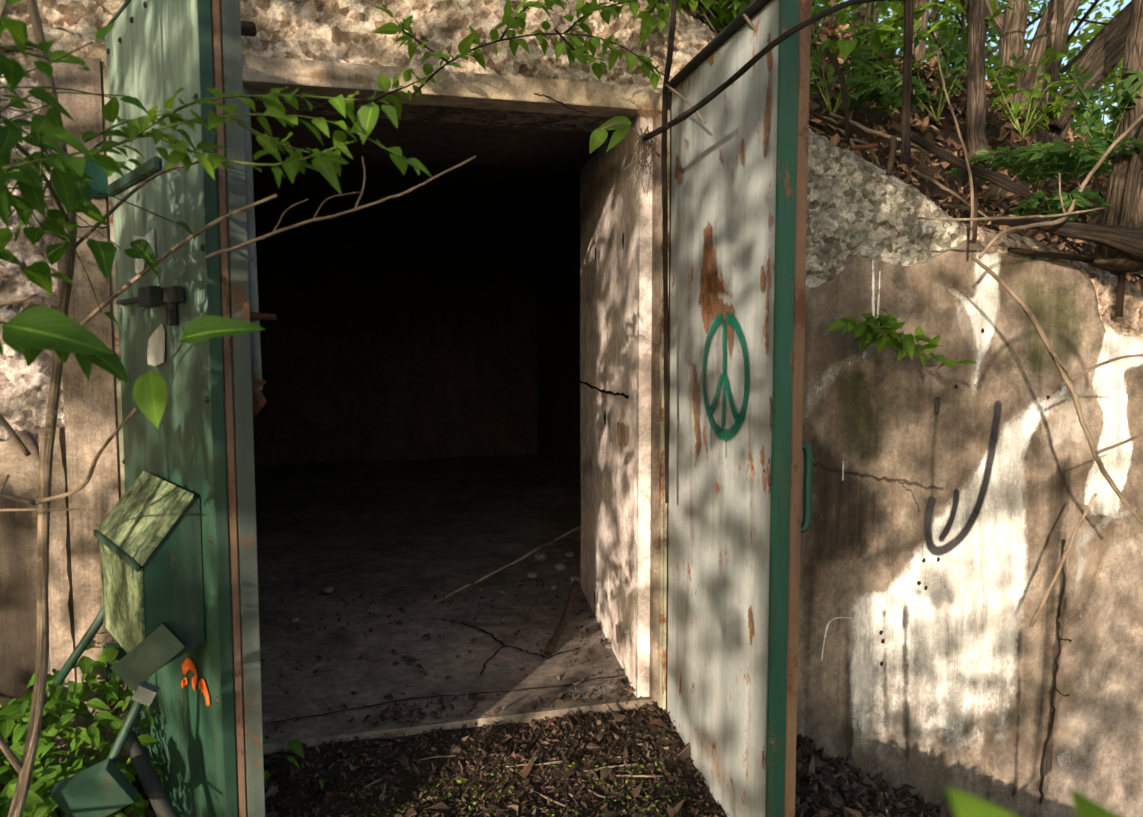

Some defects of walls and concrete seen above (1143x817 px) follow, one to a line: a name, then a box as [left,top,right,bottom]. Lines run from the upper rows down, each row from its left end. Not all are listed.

spalling [240,0,718,88]
water stain [0,485,37,706]
spalling [0,0,126,446]
crack [270,618,624,723]
crack [571,379,629,399]
rust [698,223,735,358]
rust [760,446,771,494]
water stain [806,436,885,638]
crack [803,460,942,513]
water stain [846,401,1049,795]
spalling [805,129,1143,343]
water stain [1040,333,1143,776]